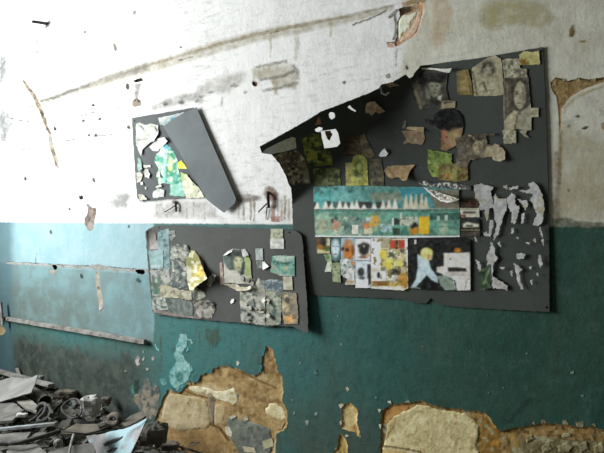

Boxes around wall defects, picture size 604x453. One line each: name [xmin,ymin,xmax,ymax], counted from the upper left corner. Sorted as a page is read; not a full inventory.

flaking render [387,0,425,53]
water stain [23,60,166,111]
peeling [550,77,604,184]
flaking render [79,195,97,231]
flaking render [131,334,296,453]
flaking render [333,403,361,453]
flaking render [378,400,604,453]